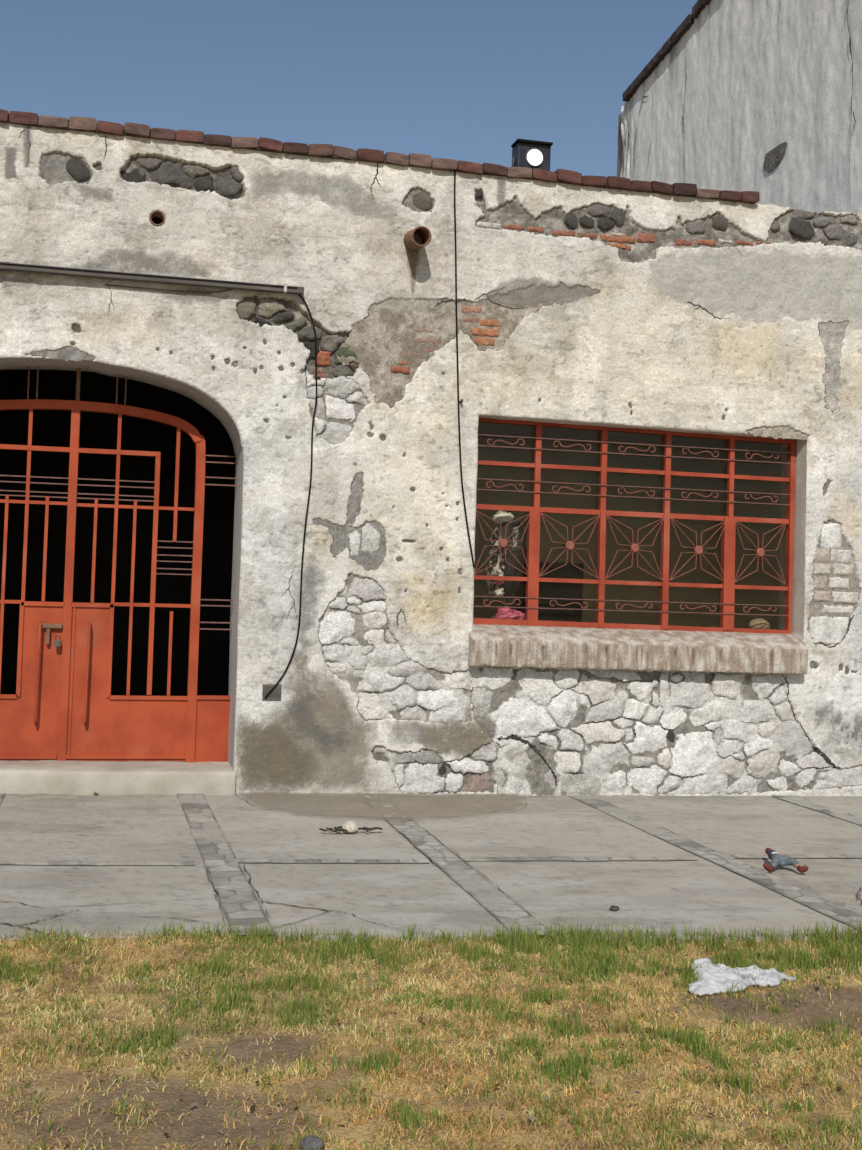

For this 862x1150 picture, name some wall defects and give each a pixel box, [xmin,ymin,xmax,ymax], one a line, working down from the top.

crack [847,0,856,193]
spalling [39,153,102,185]
spalling [121,156,245,200]
flaking render [474,189,862,263]
peeling [237,284,600,408]
peeling [313,462,402,571]
flaking render [807,520,861,646]
damp [239,652,370,792]
damp [393,722,488,757]
crack [729,868,862,910]